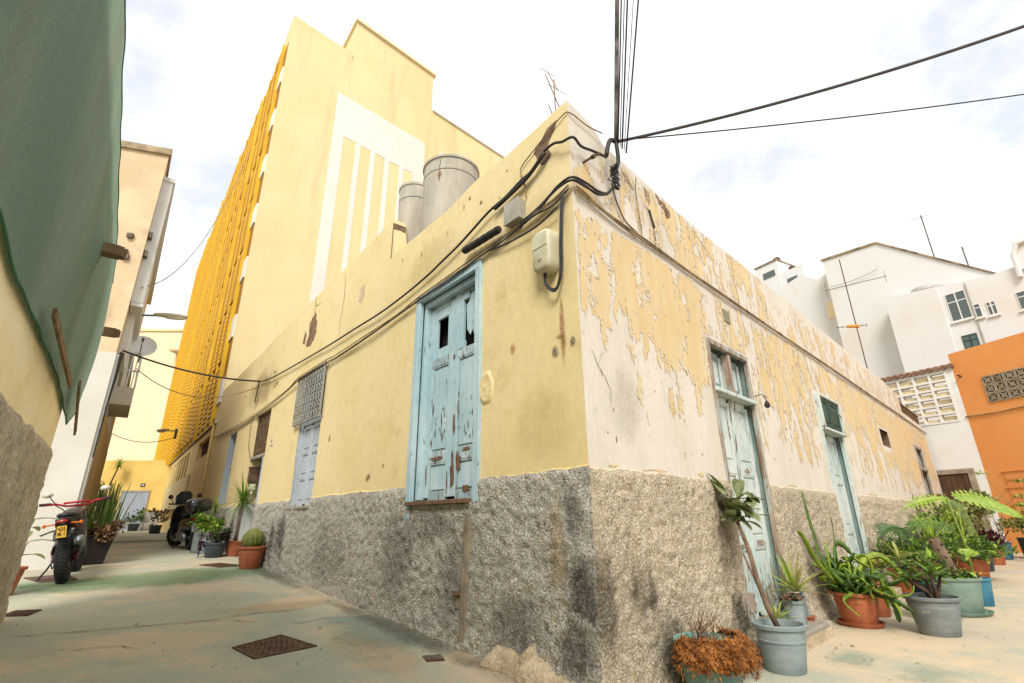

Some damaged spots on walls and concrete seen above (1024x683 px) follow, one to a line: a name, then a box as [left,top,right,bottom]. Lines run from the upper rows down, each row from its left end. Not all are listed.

flaking render [534,121,556,166]
flaking render [303,312,317,347]
peeling [572,148,941,496]
peeling [425,446,471,493]
damp [573,564,595,623]